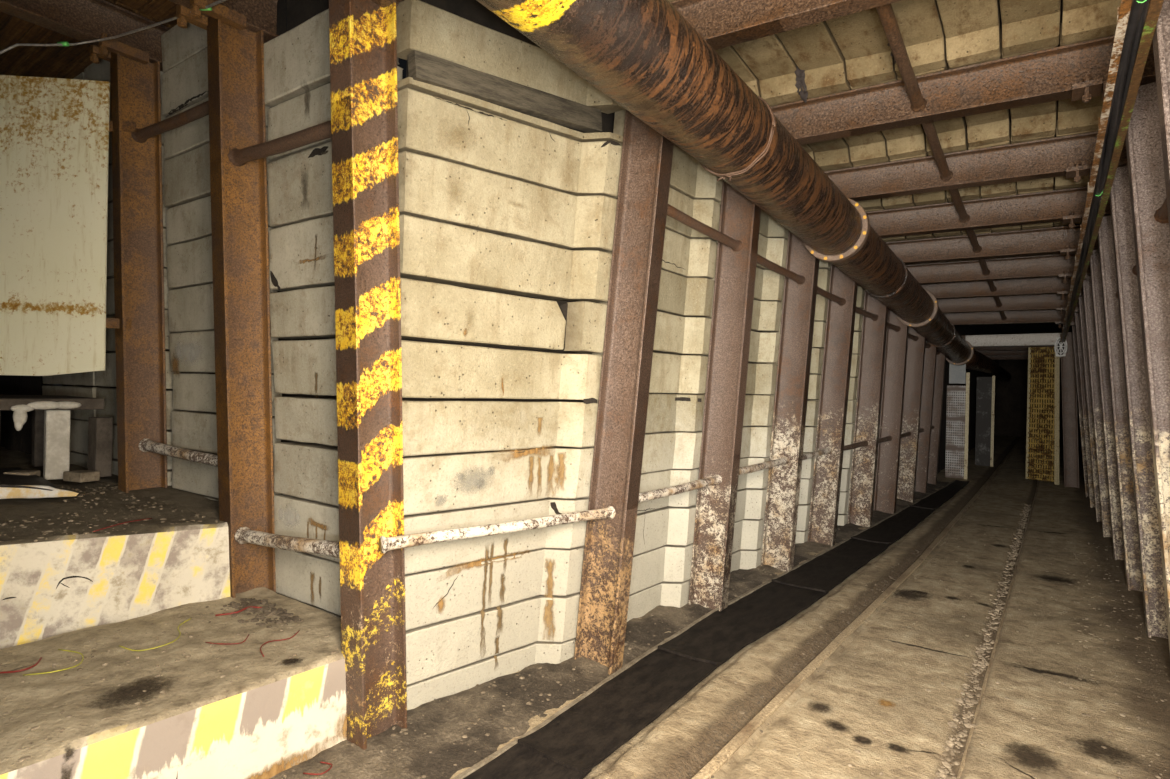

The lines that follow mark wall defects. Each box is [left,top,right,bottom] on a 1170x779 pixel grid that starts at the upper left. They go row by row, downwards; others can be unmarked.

corrosion [509,446,565,494]
corrosion [448,539,527,664]
corrosion [544,560,555,637]
damp [810,703,830,713]
damp [1006,743,1056,769]
damp [1073,738,1133,765]